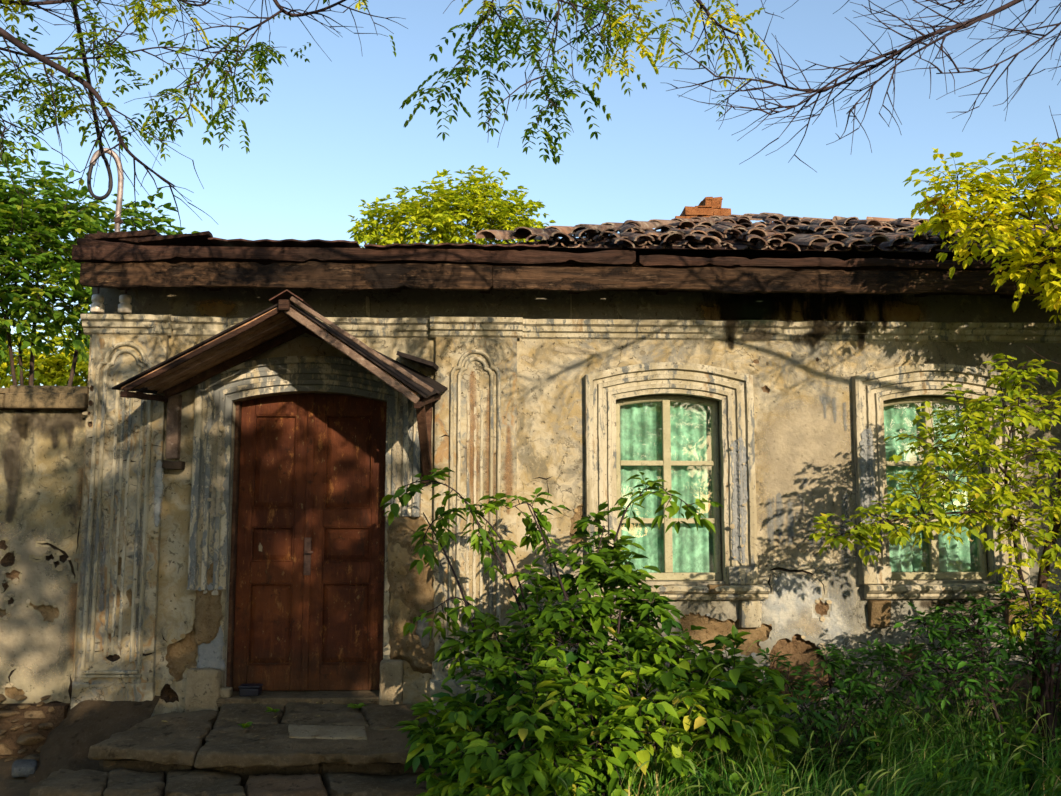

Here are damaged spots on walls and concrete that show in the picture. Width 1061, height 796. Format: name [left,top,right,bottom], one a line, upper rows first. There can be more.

leakage [721,293,888,349]
peeling [820,394,847,431]
leakage [4,409,84,523]
peeling [207,421,227,518]
spalling [0,540,59,626]
peeling [678,426,877,706]
crack [768,567,825,595]
spalling [1,683,25,699]
spalling [159,624,226,704]